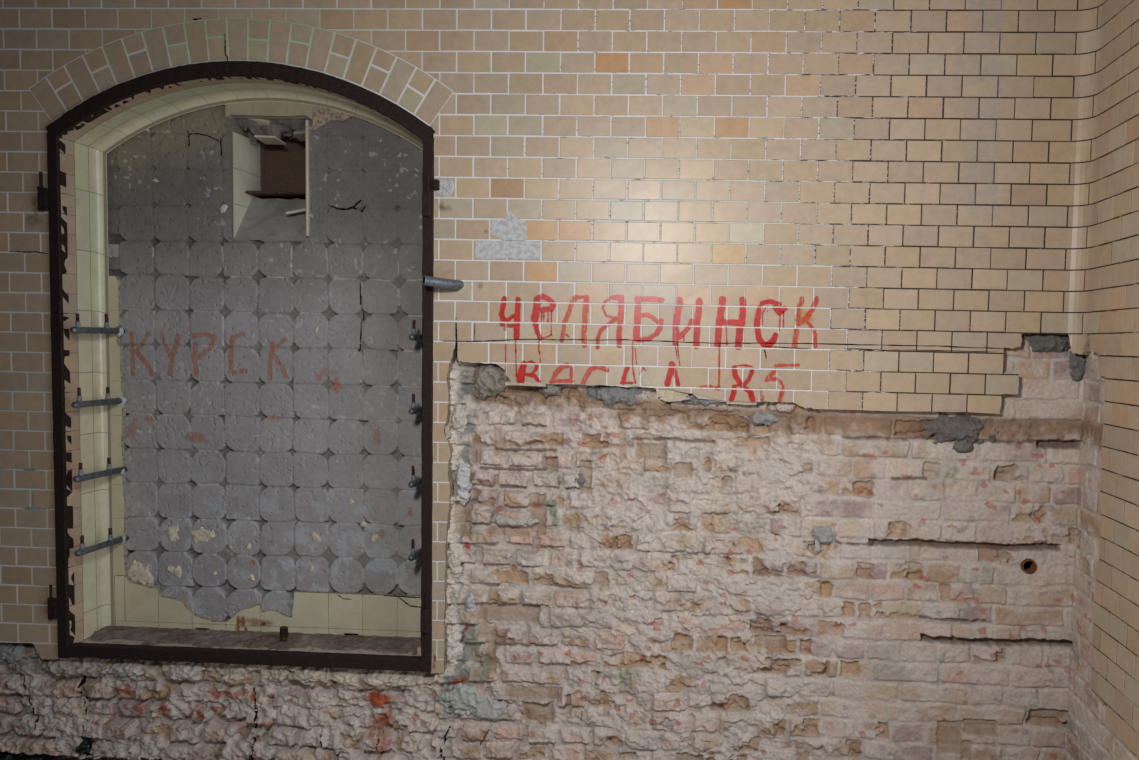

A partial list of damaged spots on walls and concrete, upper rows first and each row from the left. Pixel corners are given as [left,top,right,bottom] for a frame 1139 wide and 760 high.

crack [188,133,222,156]
crack [331,200,366,212]
spalling [107,105,423,621]
crack [357,280,365,352]
crack [455,318,1002,362]
spalling [0,334,1139,760]